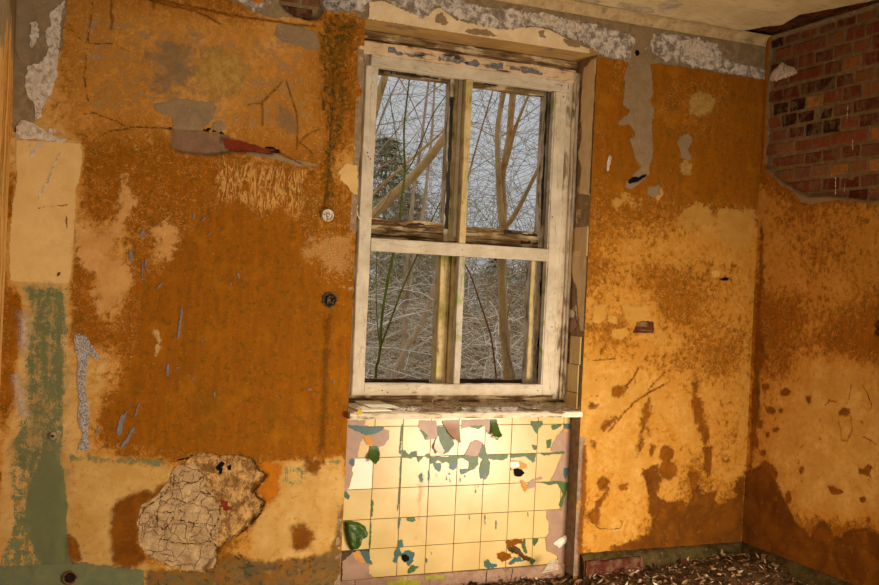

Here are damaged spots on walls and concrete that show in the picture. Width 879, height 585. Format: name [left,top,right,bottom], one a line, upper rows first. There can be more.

peeling [15,0,66,143]
crack [69,2,171,140]
spalling [154,98,308,221]
flaking render [235,0,323,50]
crack [246,30,337,205]
flaking render [354,0,879,213]
peeling [74,334,101,451]
leakage [610,226,879,585]
peeling [342,500,374,581]
peeling [393,540,419,574]
peeling [344,419,571,564]
leakage [576,439,629,564]